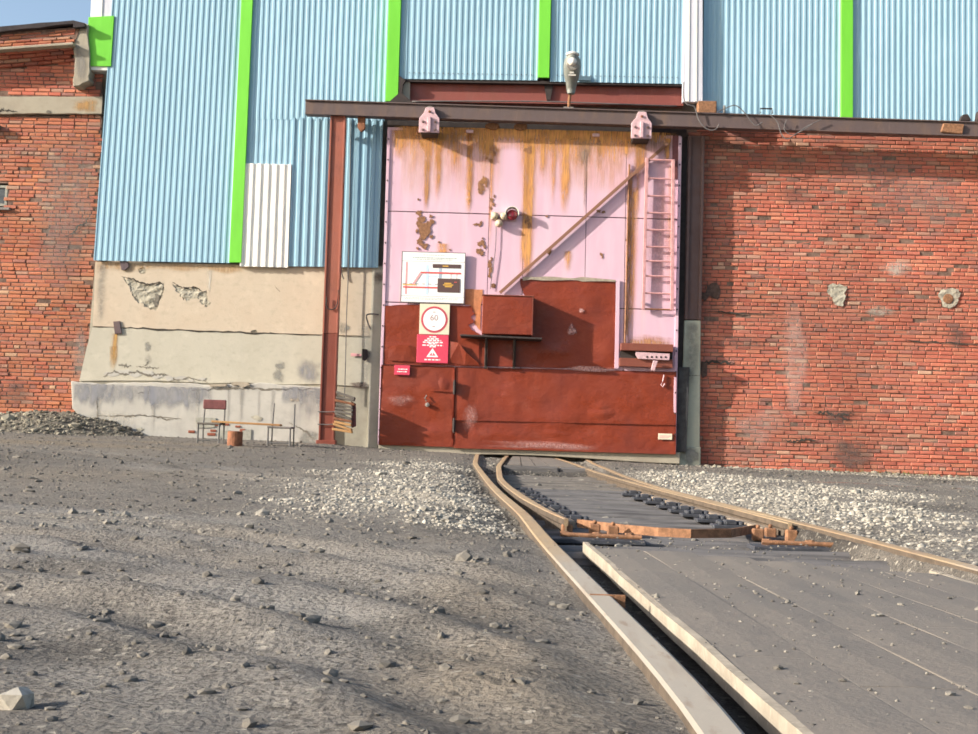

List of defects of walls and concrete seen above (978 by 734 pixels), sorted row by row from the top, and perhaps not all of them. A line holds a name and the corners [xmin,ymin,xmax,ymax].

corrosion [394,126,671,344]
crack [122,276,204,301]
spalling [124,267,211,310]
crack [127,327,311,335]
crack [119,361,159,369]
crack [96,392,180,421]
damp [74,383,203,407]
crack [192,385,313,393]